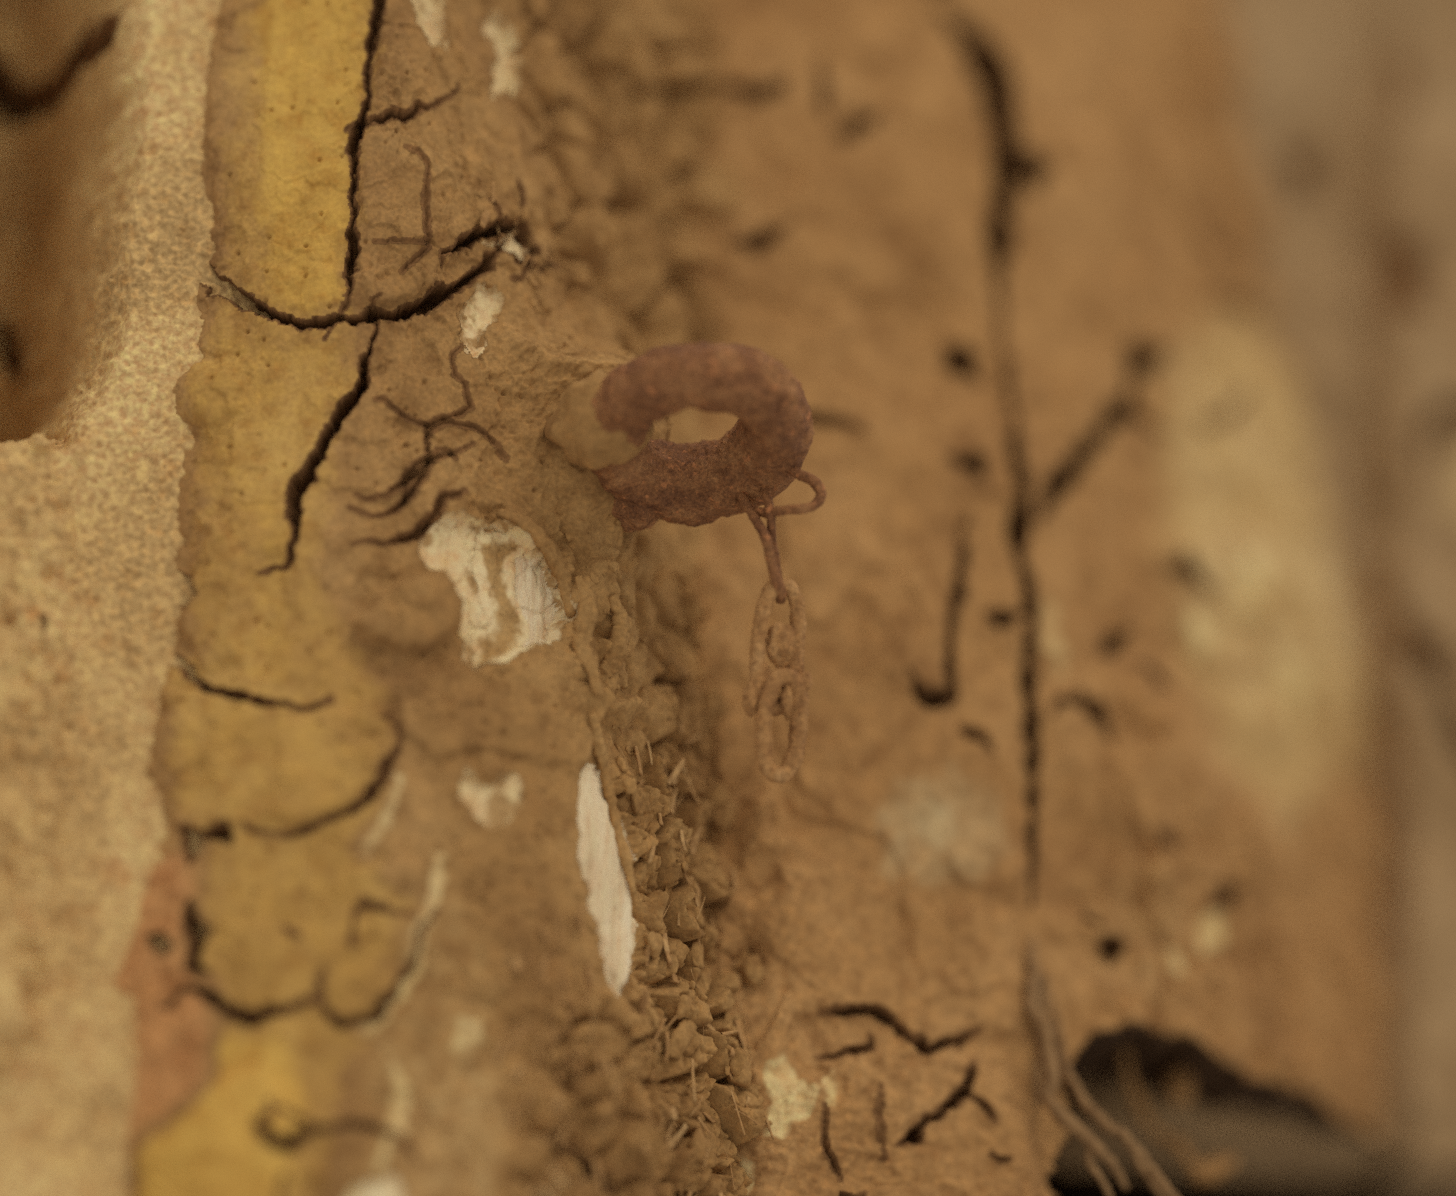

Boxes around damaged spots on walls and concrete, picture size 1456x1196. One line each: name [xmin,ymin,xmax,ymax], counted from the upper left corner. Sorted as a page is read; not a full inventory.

crack [199,0,560,576]
crack [906,6,1180,908]
crack [39,615,47,633]
crack [170,653,335,713]
peeling [418,508,636,893]
corrosion [766,622,797,721]
crack [1166,550,1221,601]
crack [240,714,405,840]
crack [159,893,441,1030]
crack [1081,908,1169,966]
crack [1203,875,1243,911]